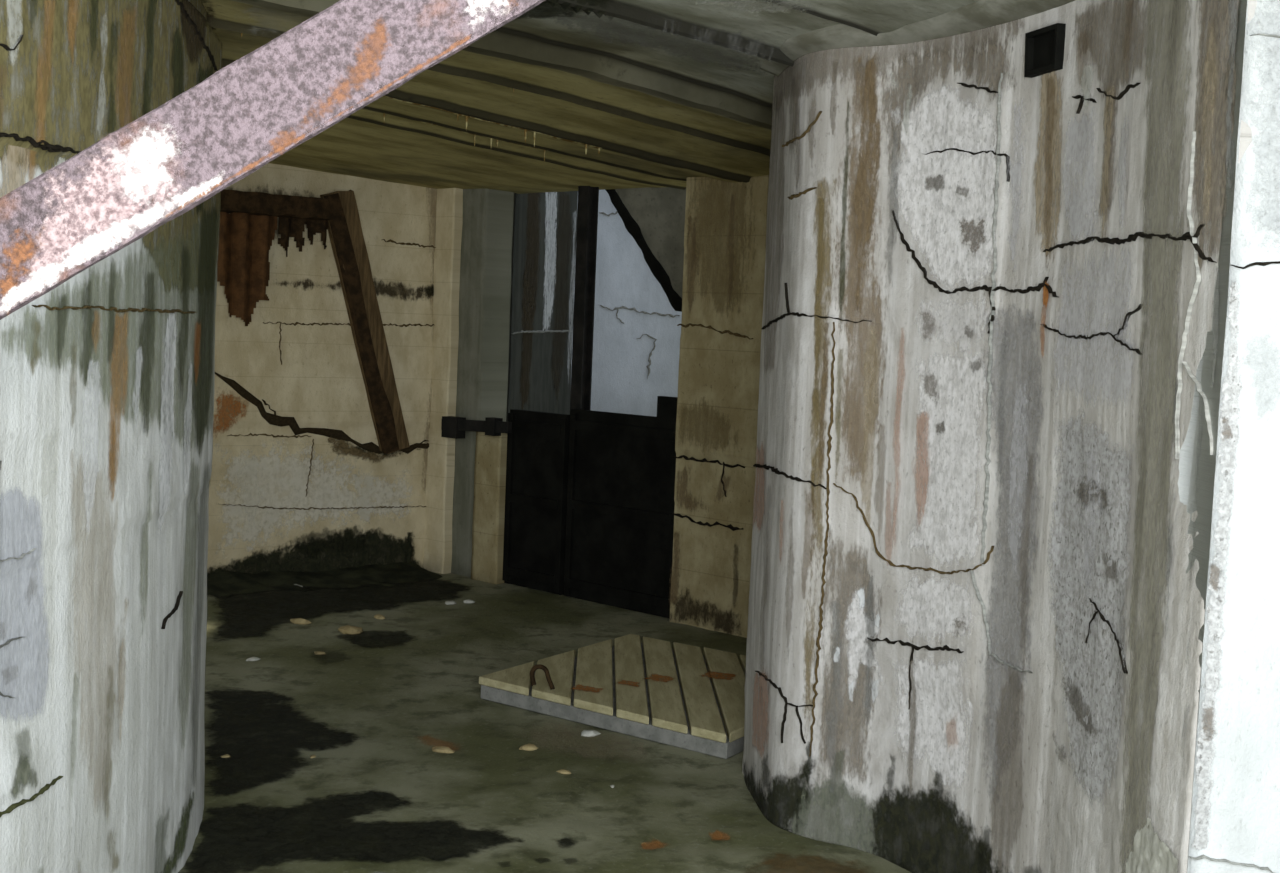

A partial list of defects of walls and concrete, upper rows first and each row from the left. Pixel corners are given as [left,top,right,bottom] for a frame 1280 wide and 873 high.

rust [320,24,470,115]
crack [0,132,81,154]
rust [166,132,305,217]
rust [0,230,34,298]
rust [217,212,277,326]
rust [109,313,128,498]
rust [213,394,246,432]
crack [215,372,429,510]
crack [600,73,1280,757]
crack [0,548,37,562]
crack [0,776,63,817]